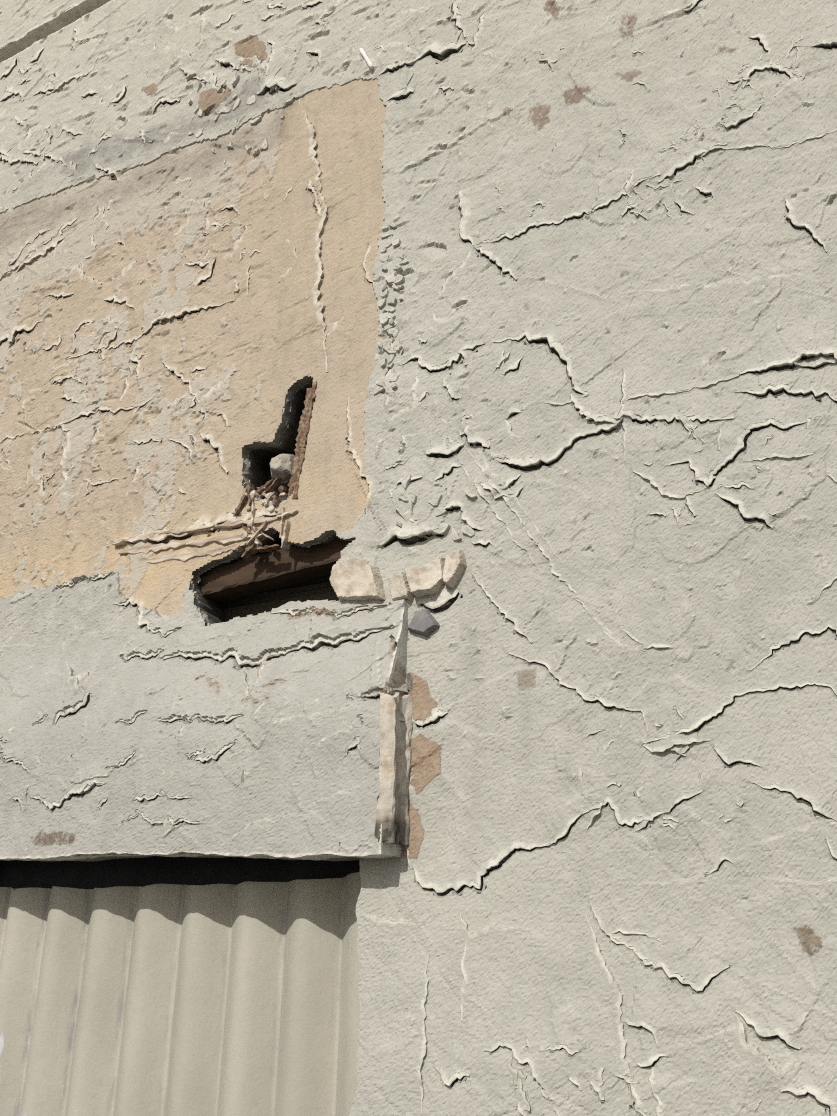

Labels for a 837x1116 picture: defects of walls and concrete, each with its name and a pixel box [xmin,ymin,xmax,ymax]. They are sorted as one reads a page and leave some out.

spalling [537,45,565,72]
crack [0,299,235,501]
peeling [0,0,420,617]
spalling [288,391,523,637]
crack [46,0,837,889]
spalling [492,351,523,375]
crack [0,755,105,813]
spalling [343,639,441,859]
crack [402,789,701,1021]
spalling [565,1048,667,1116]
crack [584,899,731,1116]
crack [733,1010,837,1116]